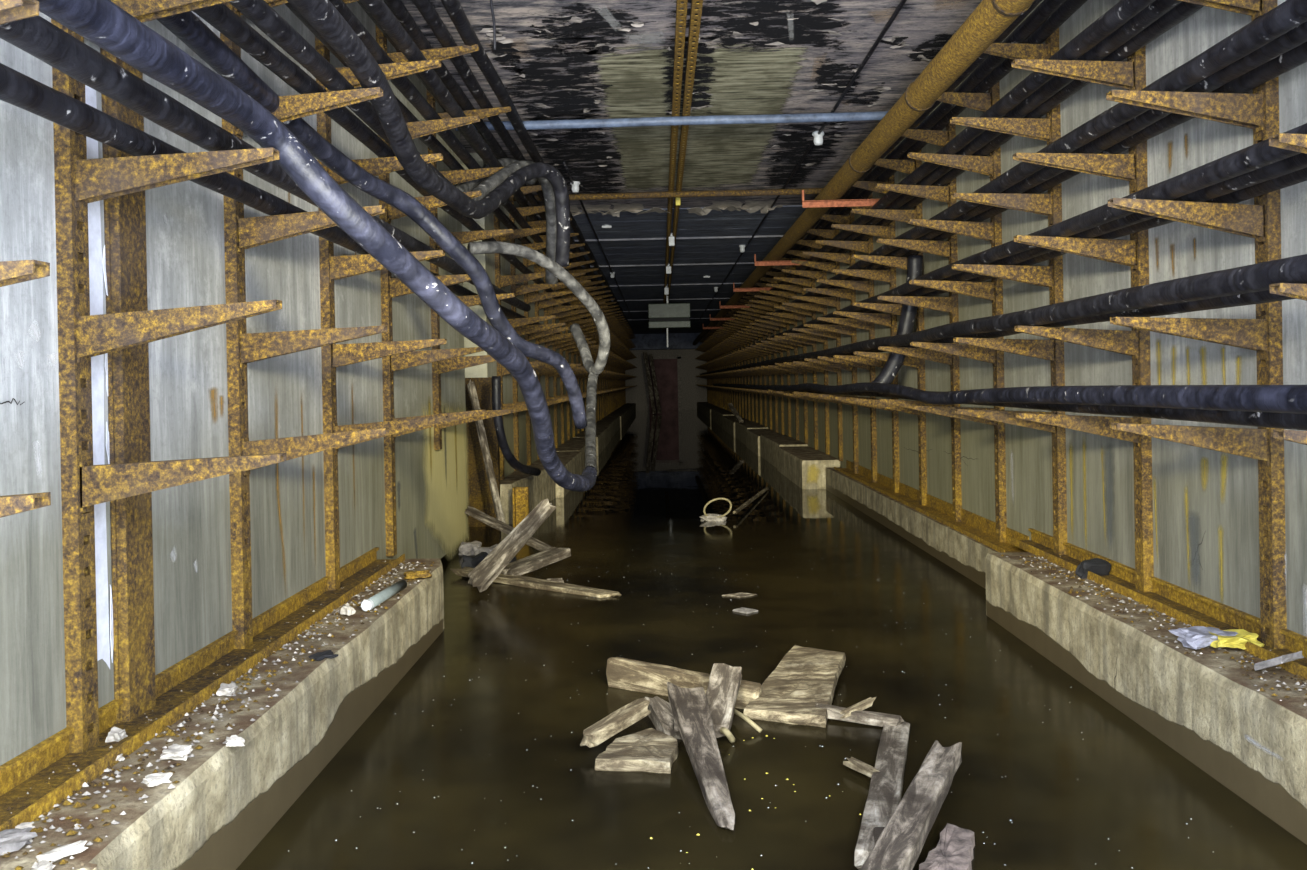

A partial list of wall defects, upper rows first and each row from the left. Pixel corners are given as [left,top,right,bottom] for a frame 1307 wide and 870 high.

rust [1168,135,1187,169]
rust [1158,342,1206,385]
rust [210,389,223,418]
rust [423,403,468,558]